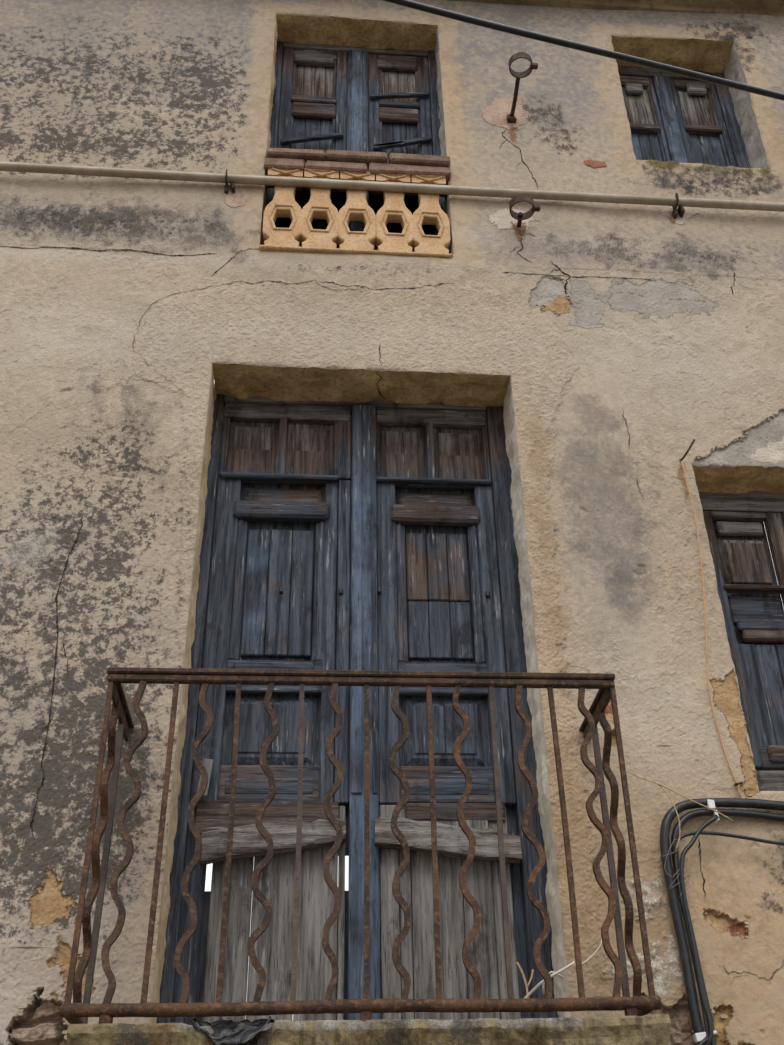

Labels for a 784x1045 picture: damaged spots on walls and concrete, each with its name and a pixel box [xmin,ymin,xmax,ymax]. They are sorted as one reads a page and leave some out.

leakage [522,95,577,154]
crack [500,128,538,187]
leakage [642,160,782,198]
crack [3,246,454,391]
peeling [608,278,719,319]
peeling [709,670,761,798]
crack [698,836,706,895]
spalling [703,909,749,939]
spalling [8,869,95,1045]
spalling [606,934,698,1045]
crack [724,960,784,985]
spalling [711,1005,750,1045]